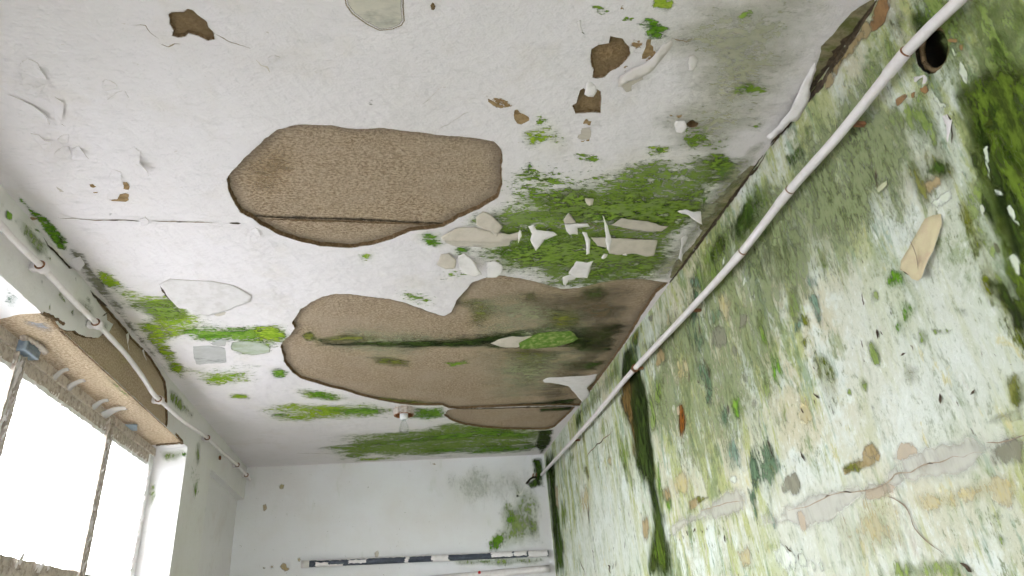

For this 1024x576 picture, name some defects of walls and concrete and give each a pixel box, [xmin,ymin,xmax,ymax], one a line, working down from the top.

spalling [168,9,215,41]
spalling [572,36,694,142]
crack [63,217,241,225]
spalling [193,124,668,430]
peeling [900,214,942,281]
crack [683,500,744,541]
crack [785,435,1024,572]